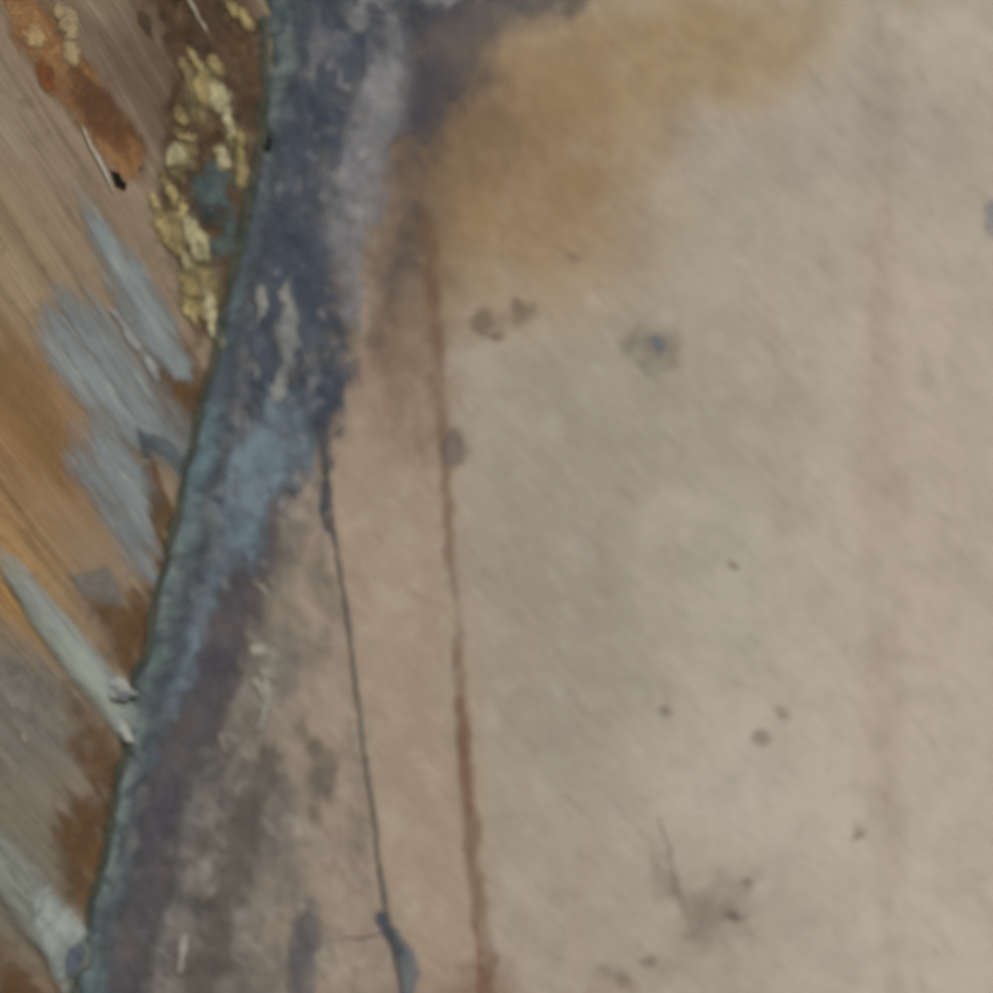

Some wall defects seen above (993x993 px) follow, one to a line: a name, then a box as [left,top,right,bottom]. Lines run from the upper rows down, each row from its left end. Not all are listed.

rust [37,63,54,91]
water stain [108,0,575,993]
crack [321,428,404,993]